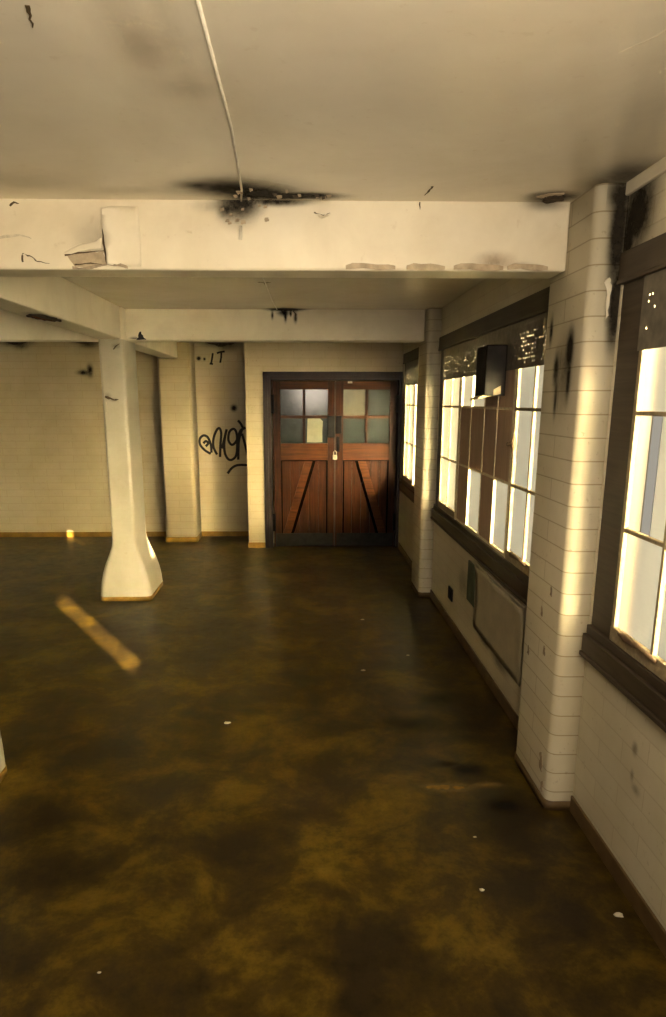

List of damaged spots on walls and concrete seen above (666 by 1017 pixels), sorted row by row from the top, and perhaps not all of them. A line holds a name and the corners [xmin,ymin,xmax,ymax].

peeling [64,206,141,269]